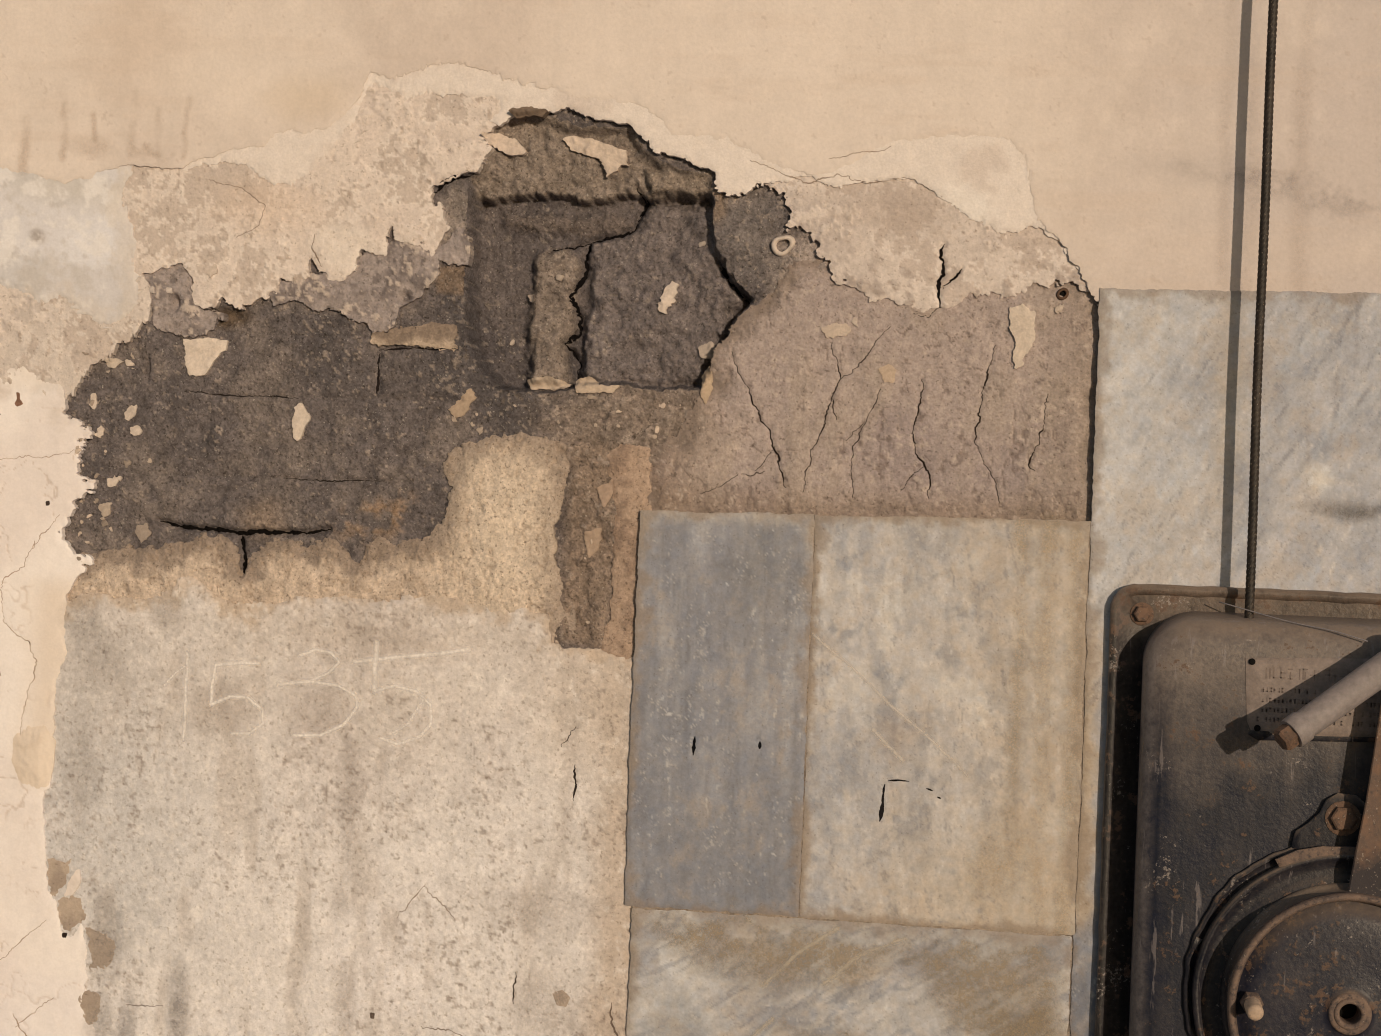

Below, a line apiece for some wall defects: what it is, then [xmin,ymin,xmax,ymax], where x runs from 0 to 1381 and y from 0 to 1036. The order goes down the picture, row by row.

spalling [0,83,1099,659]
crack [702,244,962,498]
crack [974,345,1000,504]
crack [1028,396,1048,471]
crack [161,521,331,574]
peeling [47,858,116,971]
peeling [78,990,101,1025]